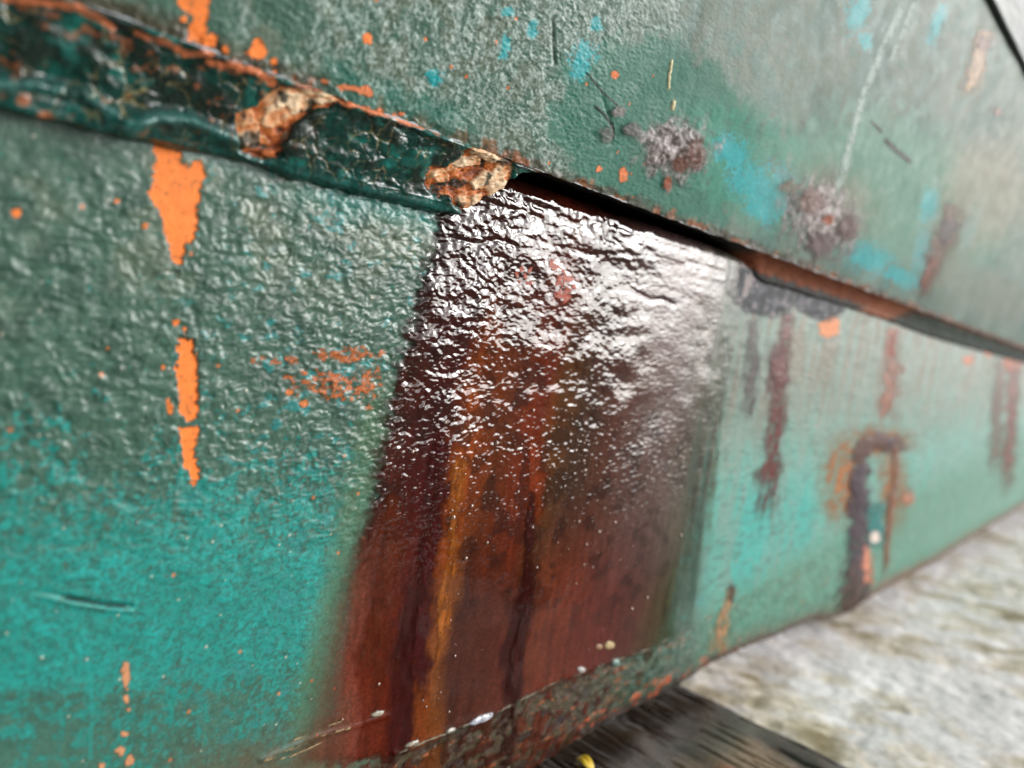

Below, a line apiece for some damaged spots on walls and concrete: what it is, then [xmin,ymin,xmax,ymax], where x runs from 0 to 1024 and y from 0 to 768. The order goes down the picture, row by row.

peeling [147,145,206,264]
rust [920,205,961,298]
peeling [162,320,200,486]
rust [316,178,736,768]
rust [744,314,793,513]
rust [826,430,914,614]